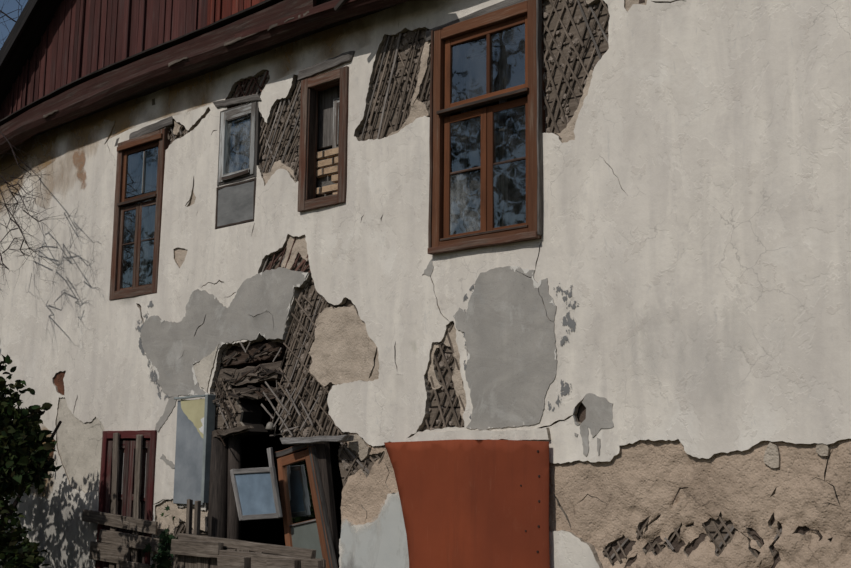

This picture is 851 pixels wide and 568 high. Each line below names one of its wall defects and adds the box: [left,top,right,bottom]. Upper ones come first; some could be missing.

spalling [228,70,270,108]
spalling [259,77,302,184]
spalling [359,28,431,141]
spalling [542,0,610,143]
spalling [188,235,409,568]
spalling [421,284,475,432]
peeling [548,380,572,412]
peeling [549,283,579,360]
spalling [578,404,586,423]
spalling [549,439,851,568]